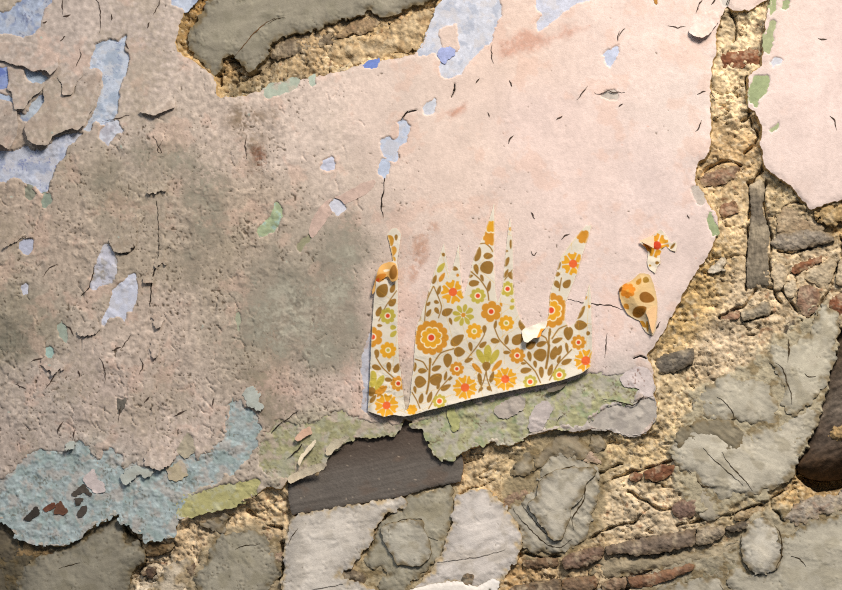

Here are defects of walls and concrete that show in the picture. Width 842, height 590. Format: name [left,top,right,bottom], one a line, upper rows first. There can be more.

peeling [171,0,198,13]
peeling [536,0,590,31]
peeling [689,0,729,38]
peeling [363,58,380,69]
peeling [417,0,502,79]
peeling [747,0,790,108]
peeling [0,0,130,208]
peeling [140,94,176,115]
peeling [262,74,316,99]
peeling [147,181,167,194]
peeling [691,185,720,236]
peeling [0,331,657,547]